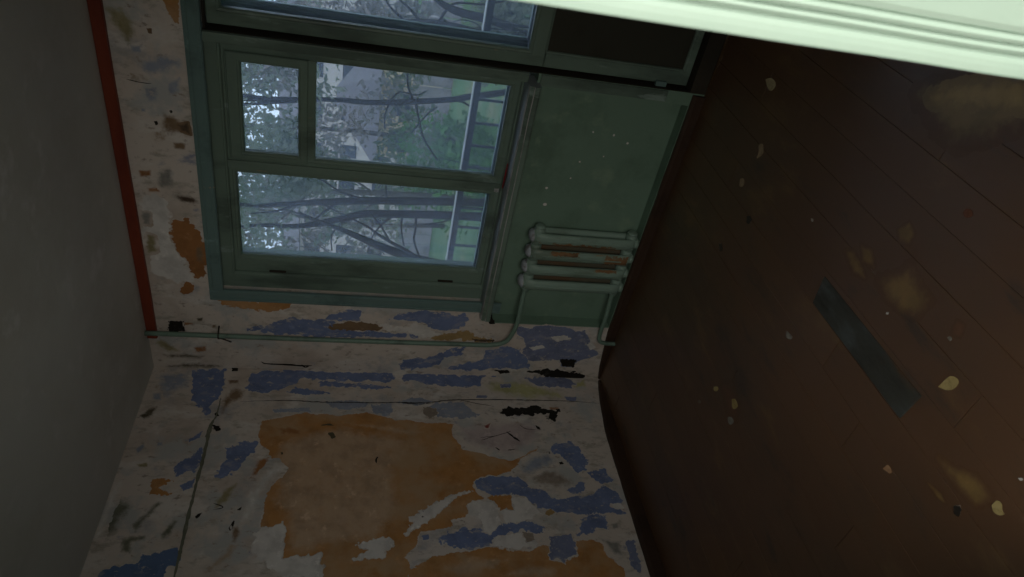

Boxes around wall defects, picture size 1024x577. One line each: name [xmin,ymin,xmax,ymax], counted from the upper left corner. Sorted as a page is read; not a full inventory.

peeling [168,217,208,296]
peeling [209,296,292,313]
spalling [167,321,195,332]
spalling [328,321,383,331]
spalling [527,359,585,378]
peeling [148,477,196,496]
crack [173,398,590,577]
peeling [256,380,626,577]